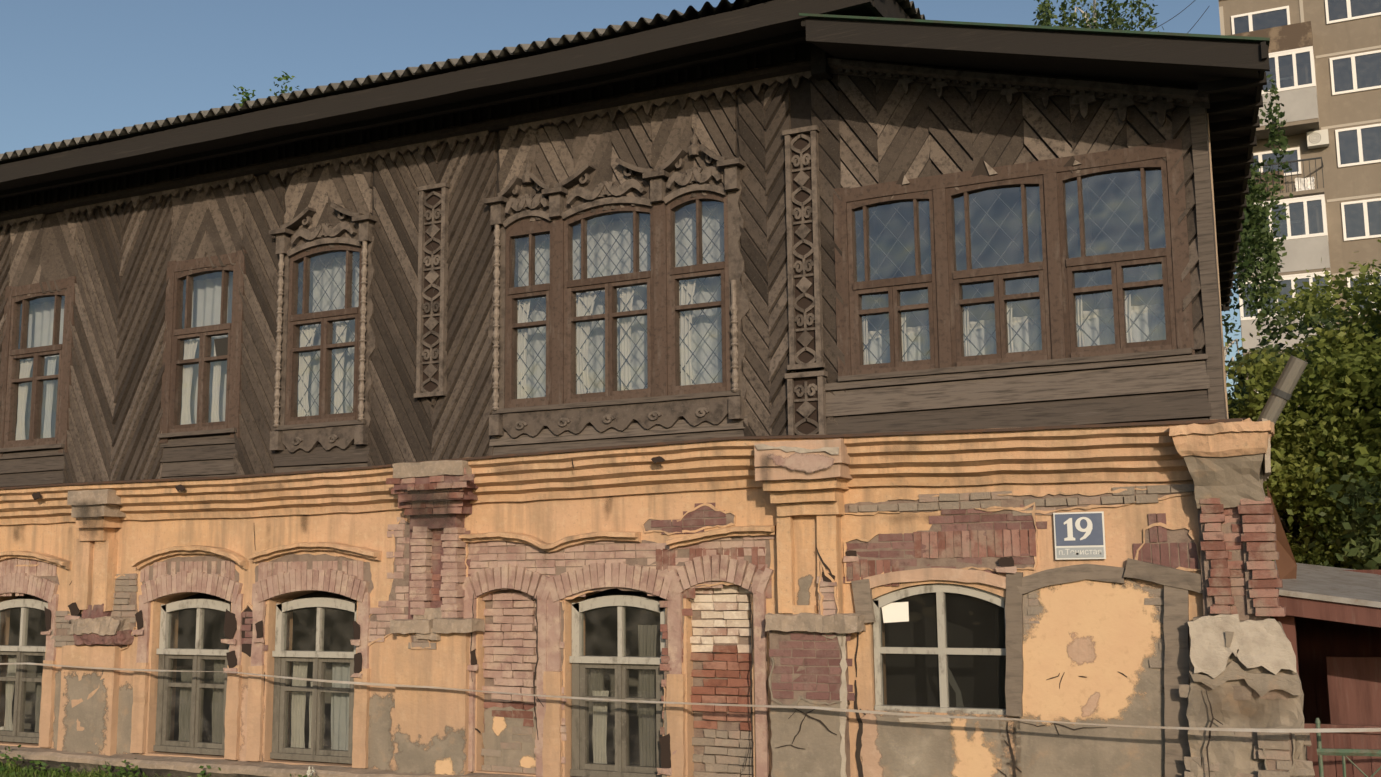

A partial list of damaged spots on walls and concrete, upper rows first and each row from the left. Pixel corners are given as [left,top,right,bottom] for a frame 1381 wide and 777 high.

spalling [797,483,1201,616]
spalling [41,517,437,762]
spalling [464,503,776,776]
crack [744,591,866,777]
spalling [768,633,855,706]
spalling [1023,589,1047,636]
spalling [1135,587,1165,668]
spalling [1179,684,1190,698]
spalling [1225,618,1297,701]
peeling [368,693,467,775]
peeling [858,713,884,777]
spalling [1182,725,1315,777]